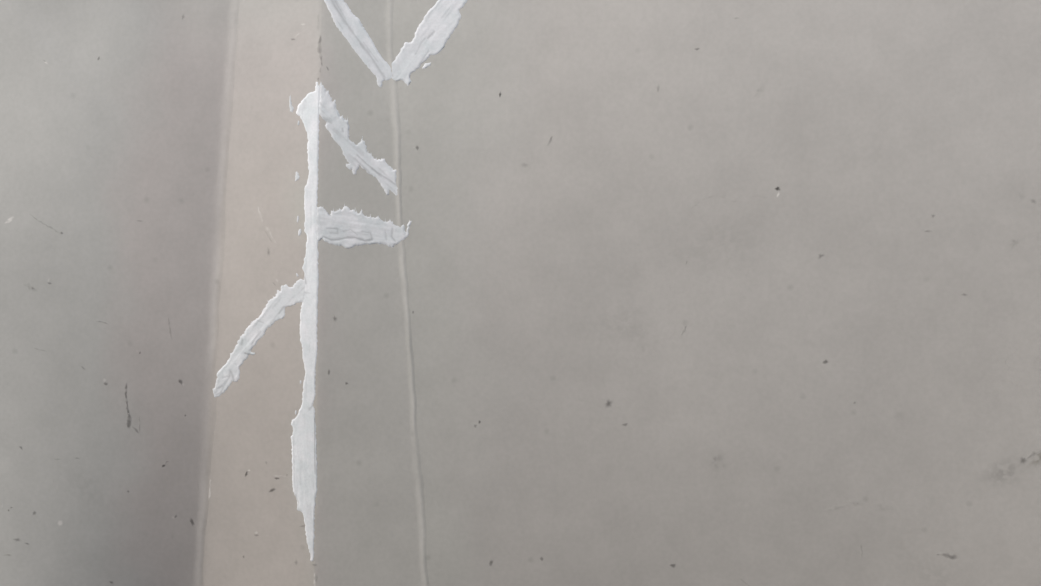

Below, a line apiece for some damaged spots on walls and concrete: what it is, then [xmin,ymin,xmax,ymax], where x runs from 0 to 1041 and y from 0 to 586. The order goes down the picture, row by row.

peeling [324,0,467,87]
peeling [213,82,412,586]